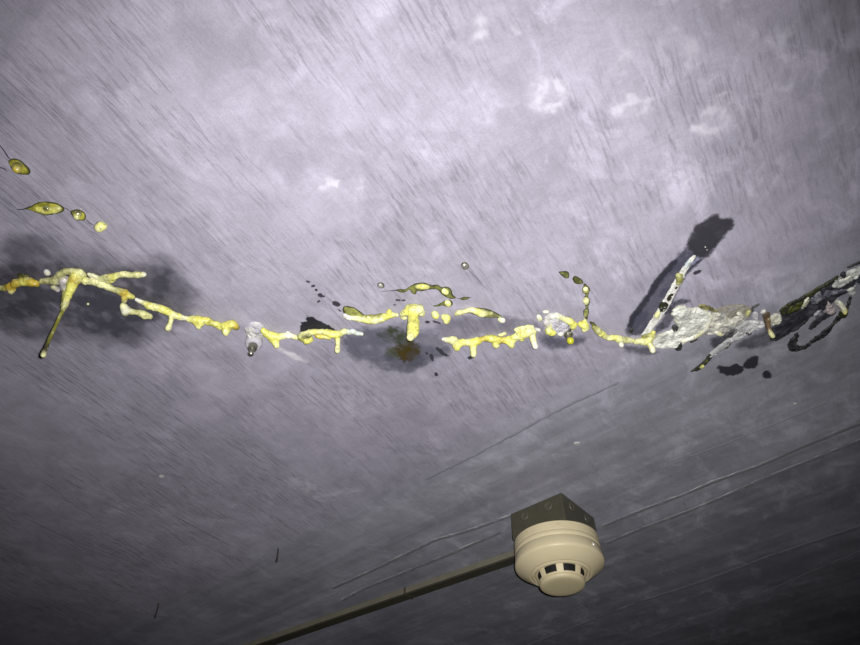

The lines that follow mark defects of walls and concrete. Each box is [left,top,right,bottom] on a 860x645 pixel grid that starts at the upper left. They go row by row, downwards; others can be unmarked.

water stain [0,243,186,342]
water stain [345,330,391,362]
corrosion [387,327,419,361]
water stain [626,215,771,378]